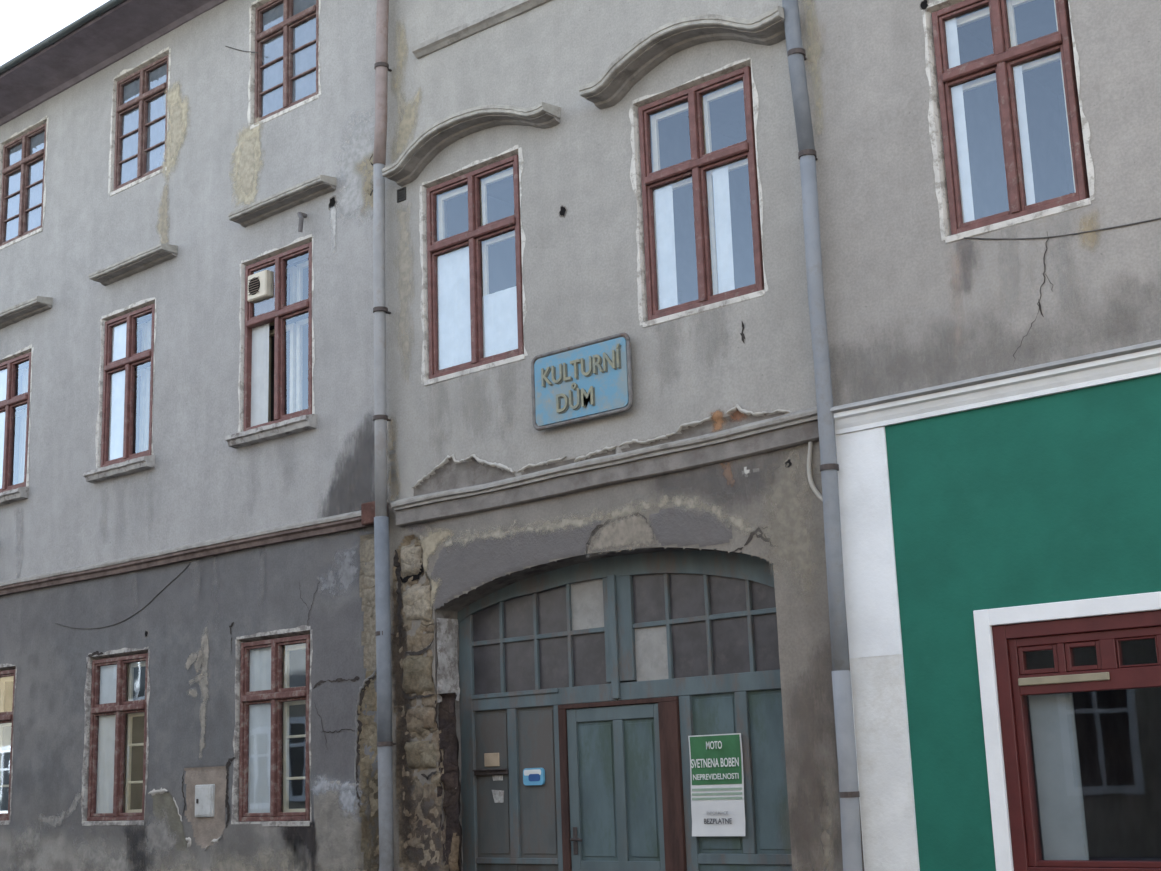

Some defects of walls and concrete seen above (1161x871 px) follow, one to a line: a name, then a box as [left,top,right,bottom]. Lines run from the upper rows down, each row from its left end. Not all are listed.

peeling [157,83,188,244]
crack [1013,234,1053,362]
water stain [325,420,375,517]
flaking render [412,404,791,496]
flaking render [144,627,235,857]
crack [313,676,360,747]
flaking render [354,531,379,871]
flaking render [391,495,752,871]